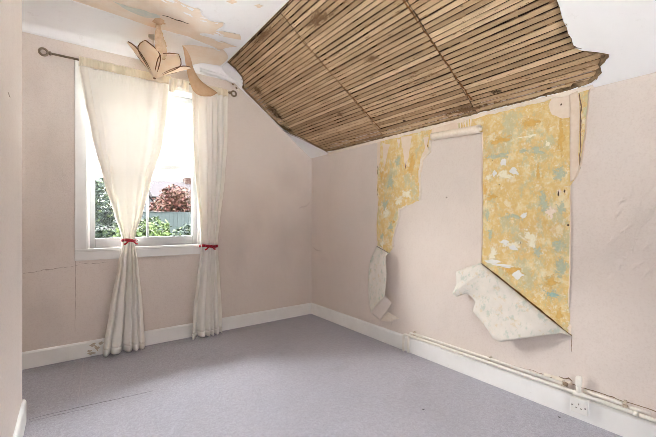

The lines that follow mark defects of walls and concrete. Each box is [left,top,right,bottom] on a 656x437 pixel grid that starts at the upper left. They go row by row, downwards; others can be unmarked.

spalling [72,0,609,351]